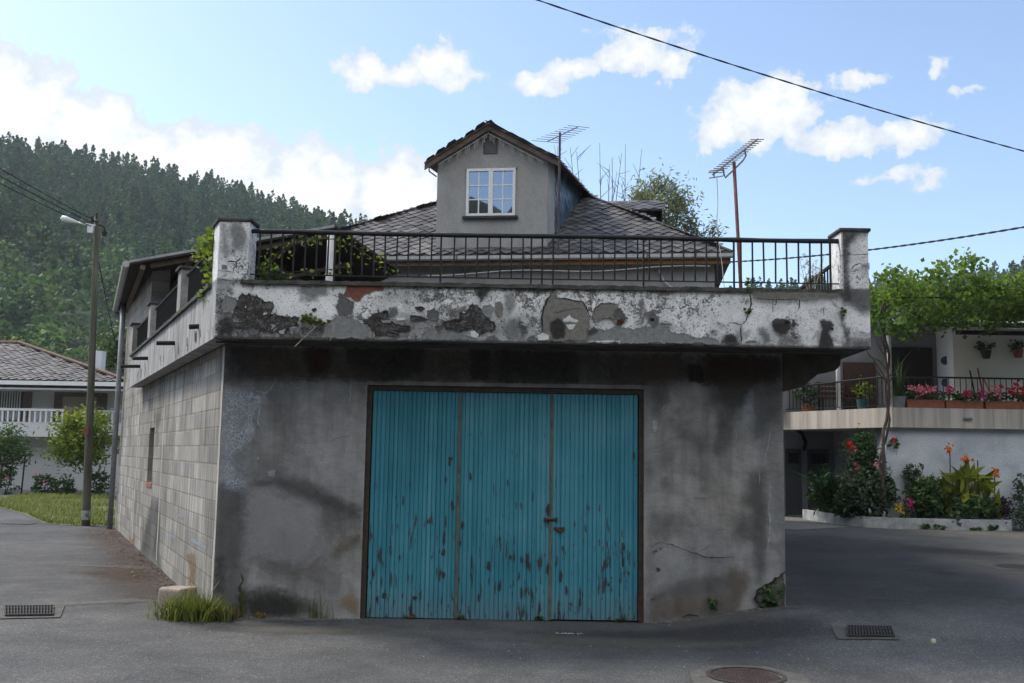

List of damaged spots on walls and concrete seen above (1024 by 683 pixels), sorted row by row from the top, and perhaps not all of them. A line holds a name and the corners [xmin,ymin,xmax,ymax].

peeling [220,222,247,270]
spalling [218,284,300,336]
spalling [300,285,514,338]
spalling [537,292,719,345]
damp [324,319,730,385]
crack [650,525,735,558]
damp [238,575,347,620]
spalling [754,572,786,609]